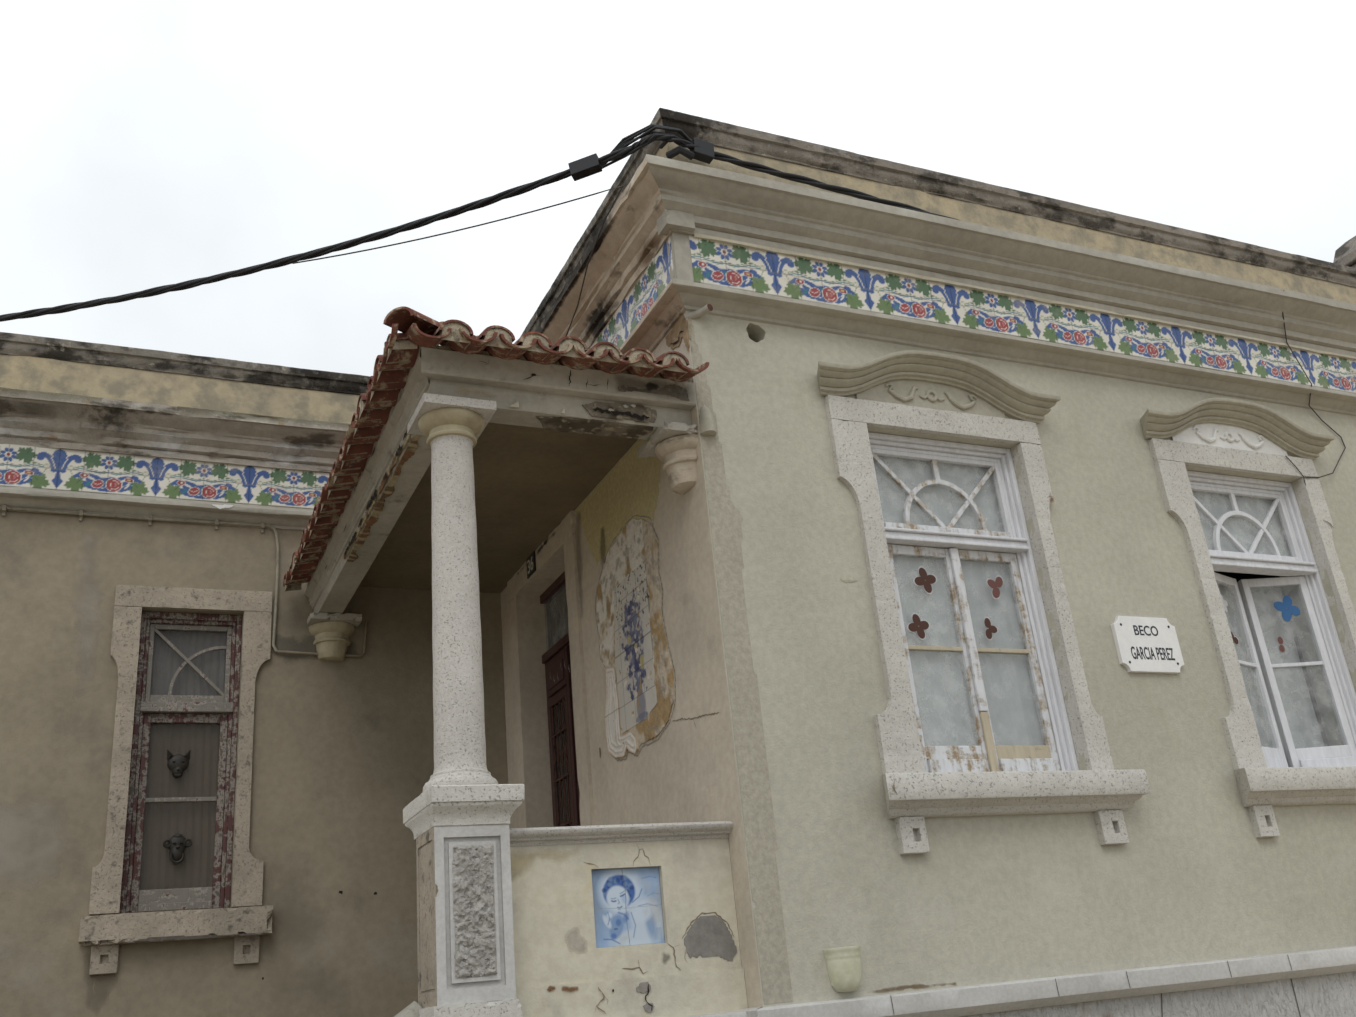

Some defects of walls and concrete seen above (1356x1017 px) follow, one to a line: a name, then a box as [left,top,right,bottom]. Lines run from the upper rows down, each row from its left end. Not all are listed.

damp [659,108,709,140]
damp [641,242,656,260]
damp [535,218,611,338]
damp [291,367,370,395]
spalling [536,383,690,439]
peeling [595,515,676,762]
crack [673,712,719,729]